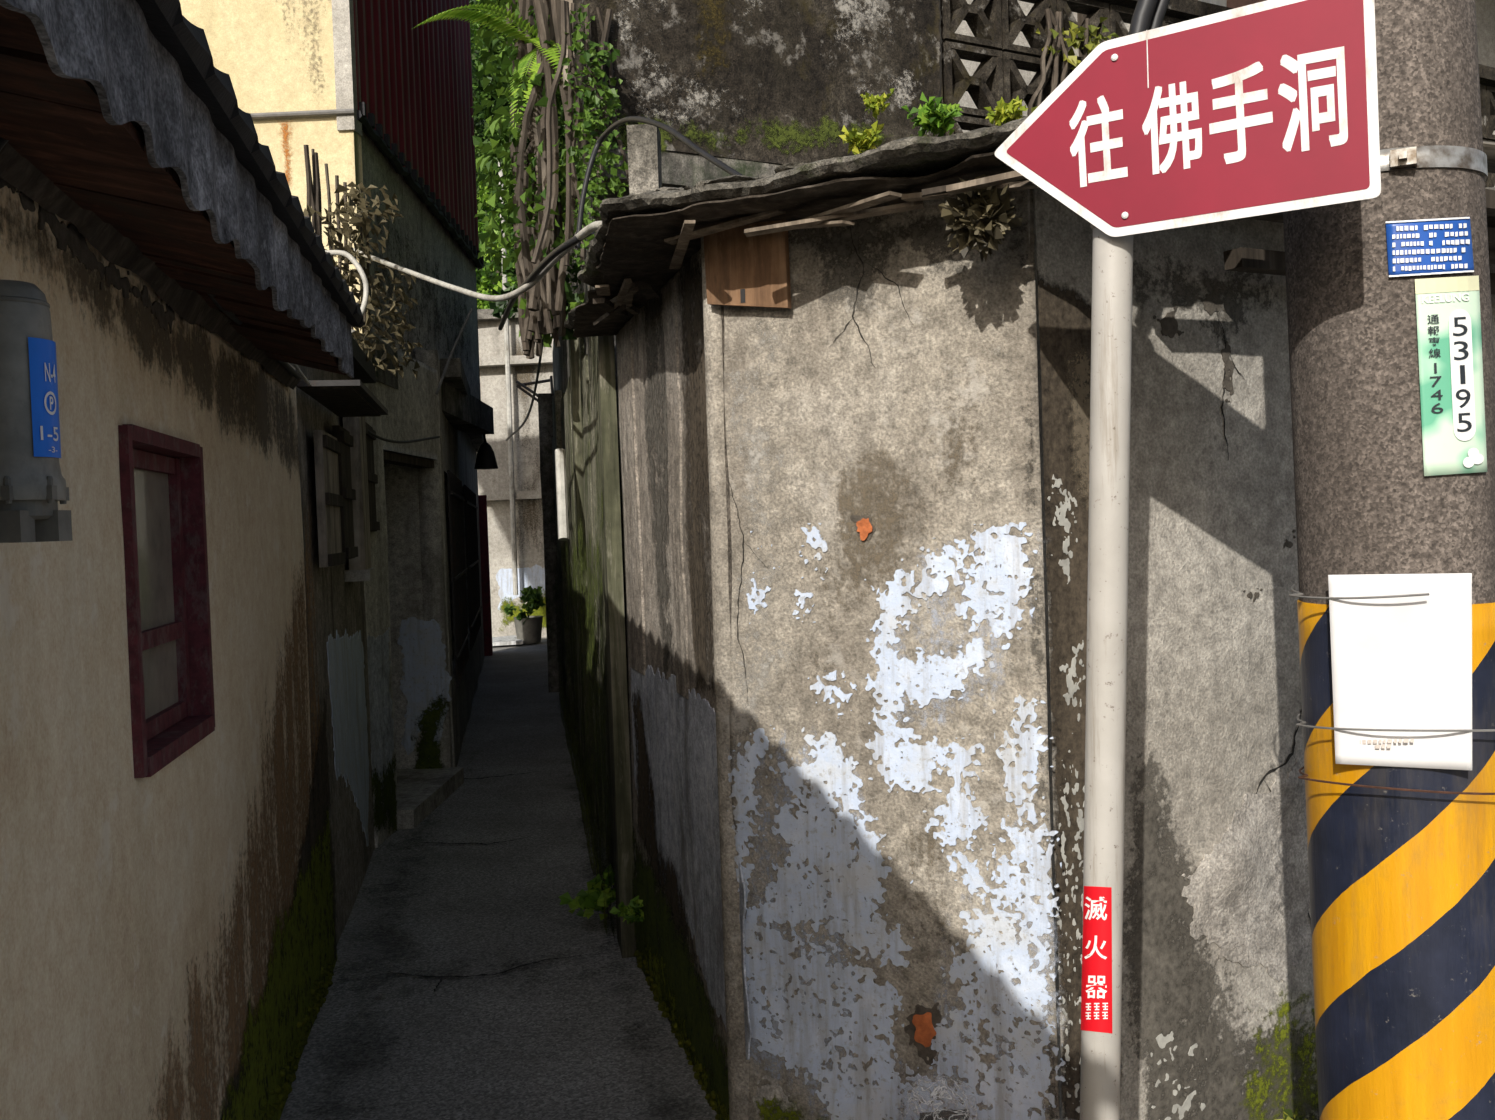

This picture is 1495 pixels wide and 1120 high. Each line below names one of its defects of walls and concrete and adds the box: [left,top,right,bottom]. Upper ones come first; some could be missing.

leakage [0,197,302,481]
crack [1216,308,1245,460]
leakage [220,692,337,1120]
peeling [631,474,1086,1120]
crack [1256,709,1302,794]